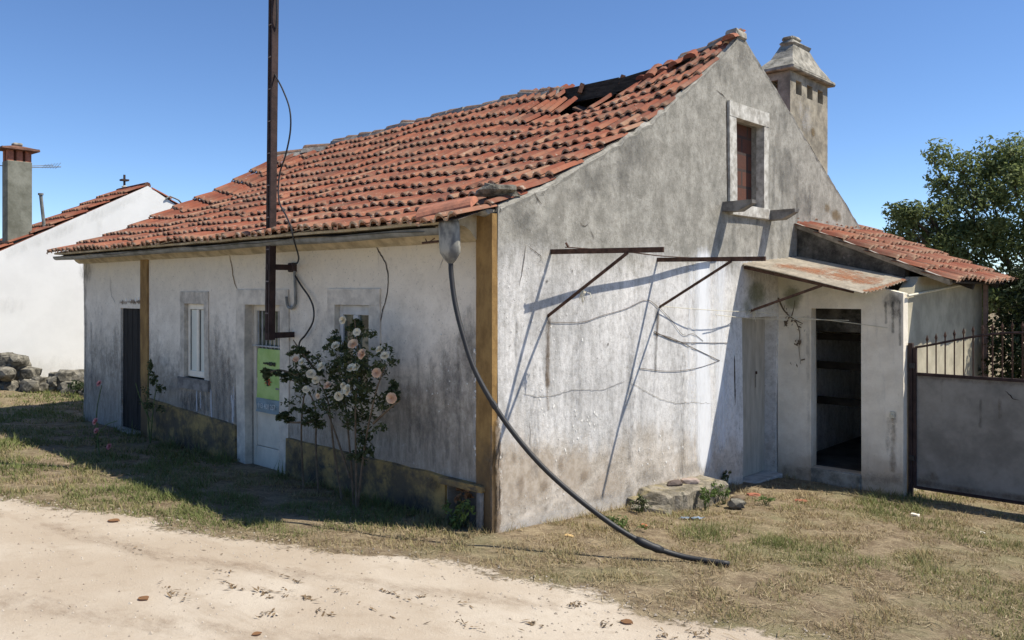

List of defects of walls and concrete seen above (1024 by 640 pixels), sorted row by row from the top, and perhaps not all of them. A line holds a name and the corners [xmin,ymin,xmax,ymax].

corrosion [781,264,905,292]